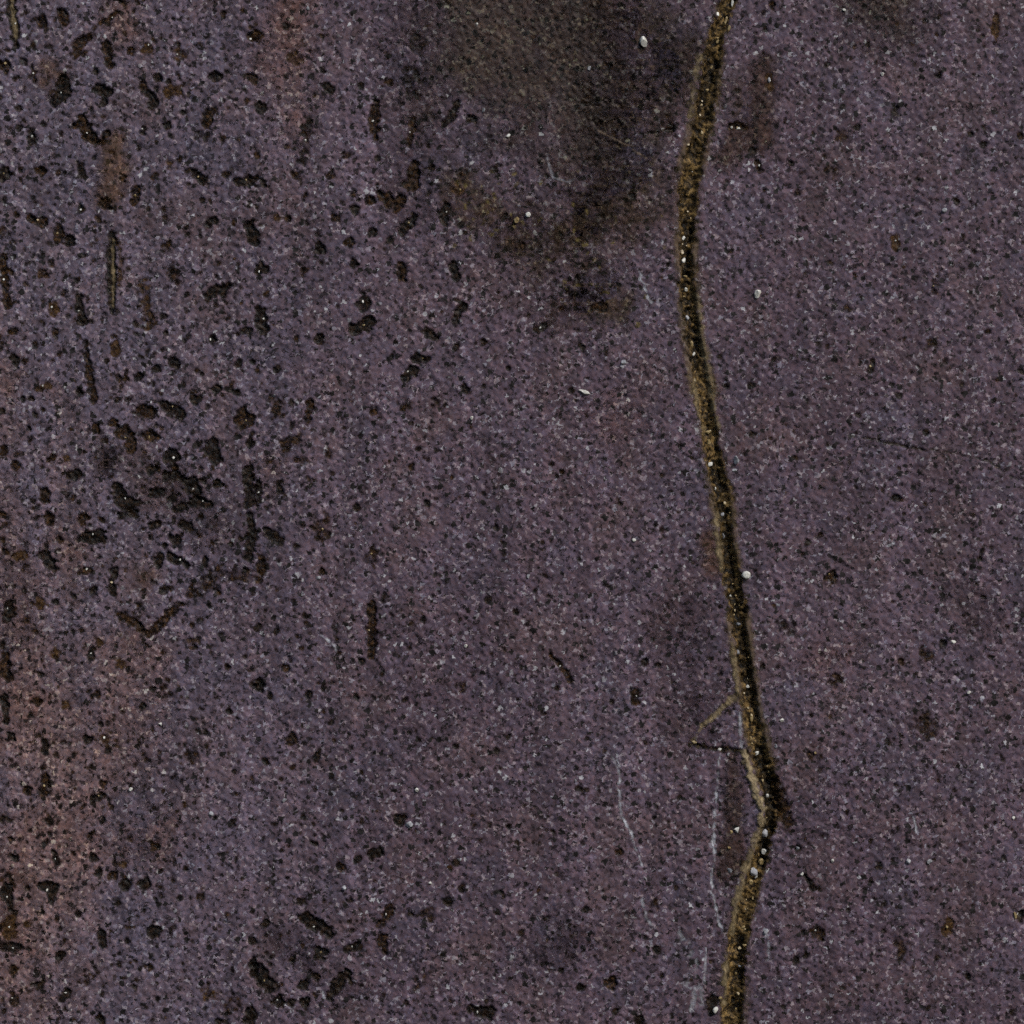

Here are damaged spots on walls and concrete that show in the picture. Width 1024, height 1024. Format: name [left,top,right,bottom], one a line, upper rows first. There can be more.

water stain [430,0,623,177]
crack [599,0,795,1024]